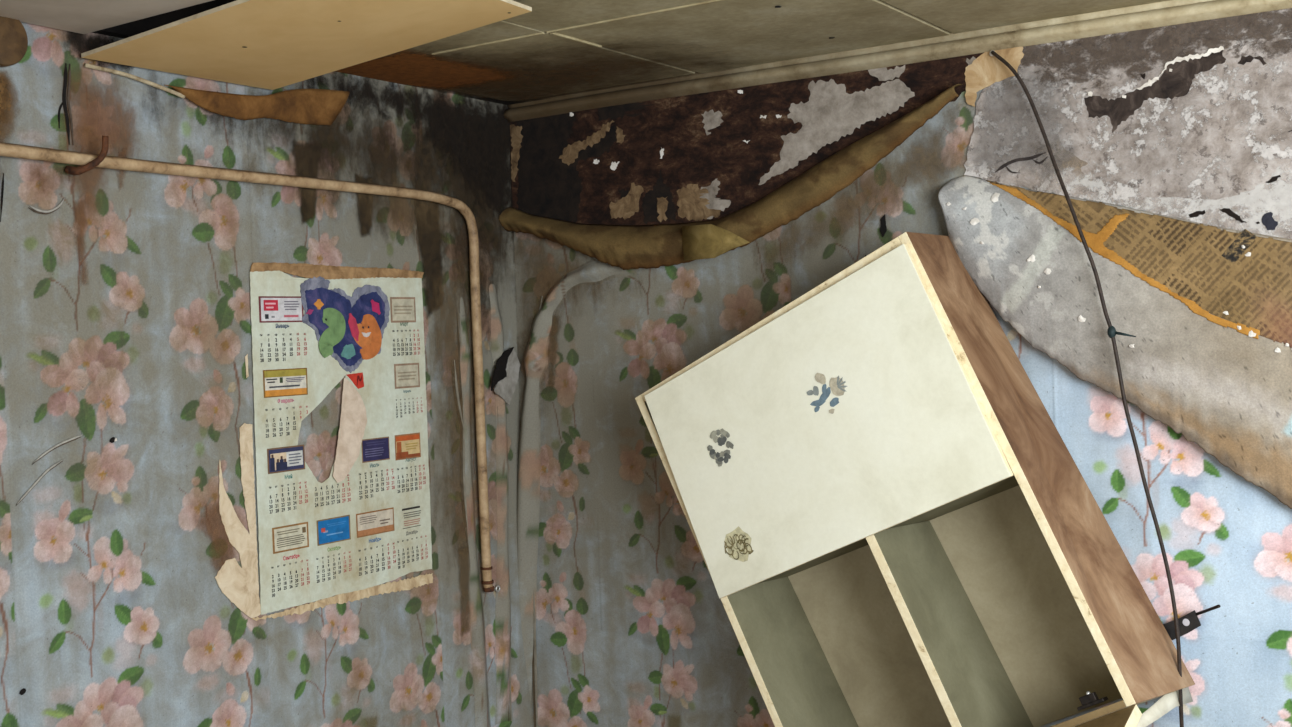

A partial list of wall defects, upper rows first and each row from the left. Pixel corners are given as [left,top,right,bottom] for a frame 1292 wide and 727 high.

peeling [164,85,350,126]
flaking render [964,8,1292,239]
damp [206,45,983,634]